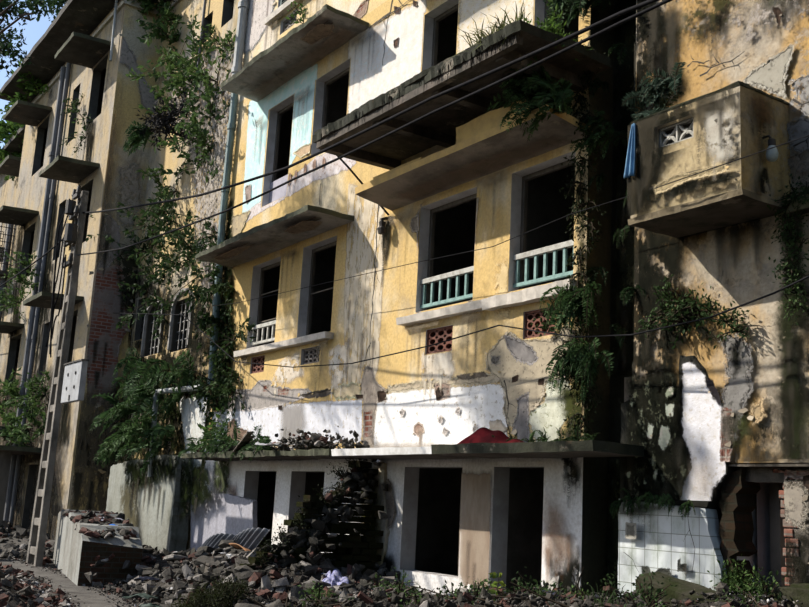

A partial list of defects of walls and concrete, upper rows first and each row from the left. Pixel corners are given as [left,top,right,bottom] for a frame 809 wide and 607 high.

peeling [167,0,276,314]
peeling [654,165,729,194]
crack [687,51,745,76]
peeling [787,75,809,153]
damp [621,0,734,501]
peeling [221,323,570,447]
peeling [706,333,766,462]
damp [742,291,809,462]
damp [549,550,580,595]
spalling [718,468,761,583]